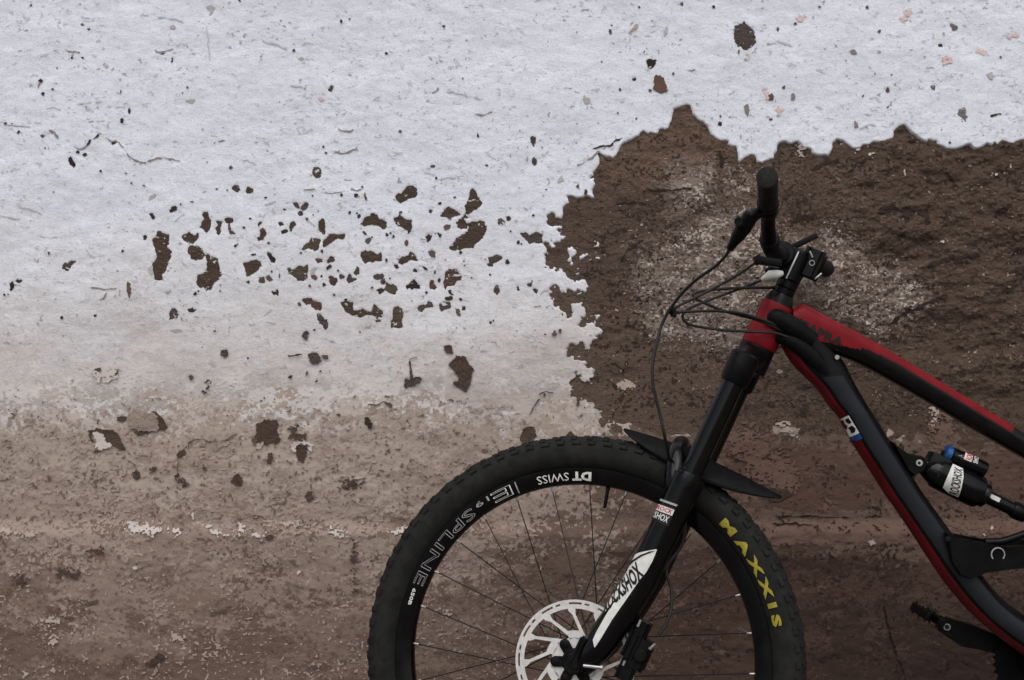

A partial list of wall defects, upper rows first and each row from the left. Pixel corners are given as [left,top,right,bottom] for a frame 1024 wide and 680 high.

spalling [734,21,756,54]
spalling [143,185,544,340]
spalling [306,353,328,382]
spalling [404,377,422,389]
spalling [444,345,474,392]
peeling [617,379,637,390]
spalling [88,416,127,453]
spalling [134,411,168,436]
spalling [251,419,314,464]
peeling [723,421,803,495]
peeling [923,412,955,453]